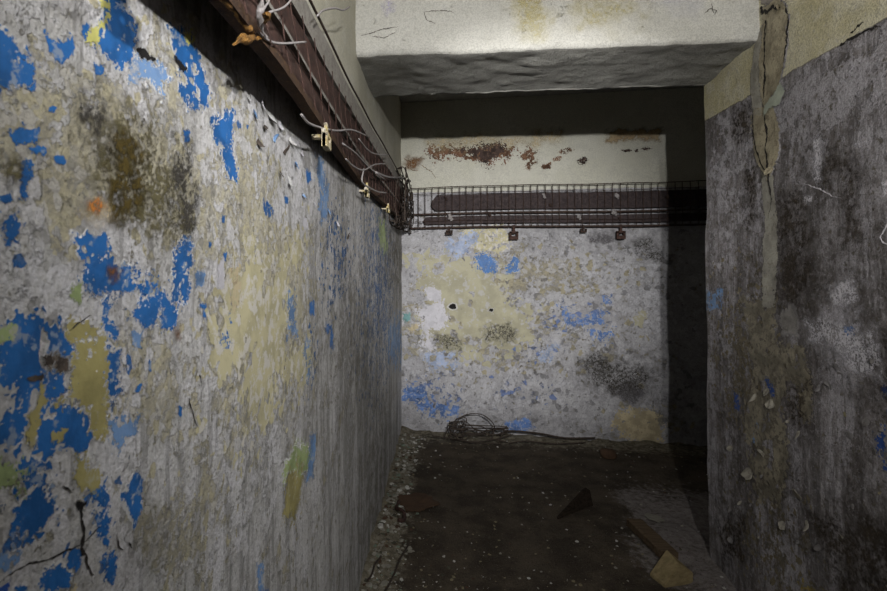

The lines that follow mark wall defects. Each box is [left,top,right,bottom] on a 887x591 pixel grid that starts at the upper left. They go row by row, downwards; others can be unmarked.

peeling [0,22,40,95]
peeling [43,0,240,185]
crack [752,3,789,216]
water stain [78,103,201,247]
corrosion [404,155,436,178]
water stain [811,137,860,245]
peeling [0,94,340,591]
peeling [401,378,462,425]
peeling [386,224,560,374]
water stain [579,354,650,403]
water stain [805,280,887,392]
crack [0,486,133,582]